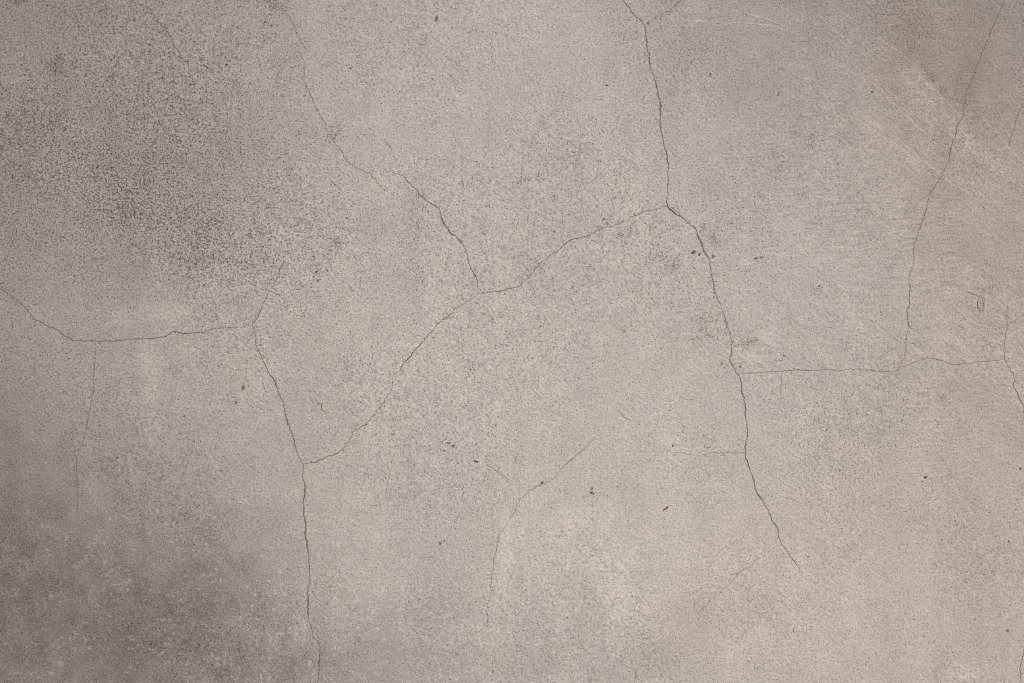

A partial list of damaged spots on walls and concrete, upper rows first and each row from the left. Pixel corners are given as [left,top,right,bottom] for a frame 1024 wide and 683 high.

crack [6,292,233,524]
crack [252,0,1024,683]